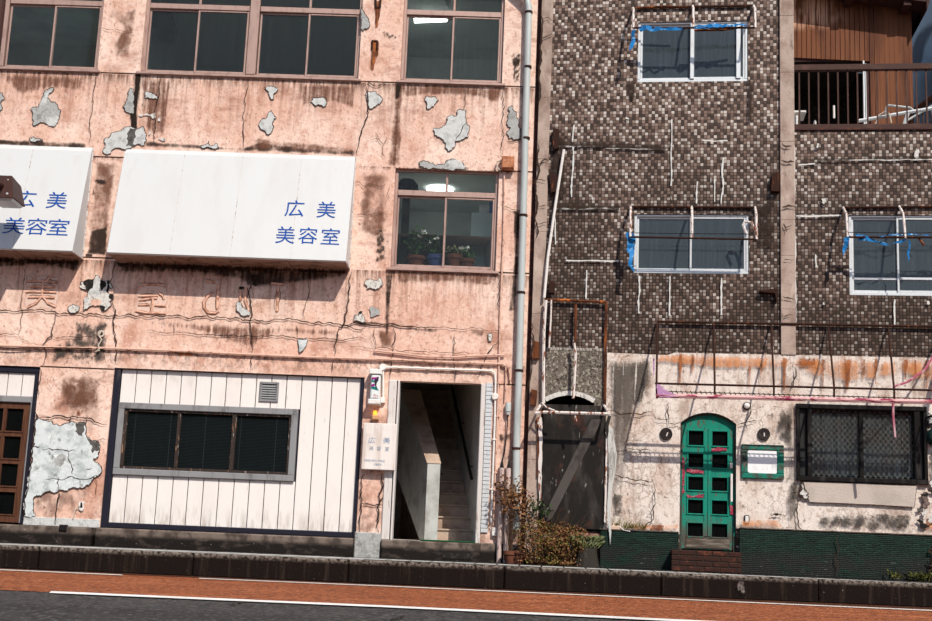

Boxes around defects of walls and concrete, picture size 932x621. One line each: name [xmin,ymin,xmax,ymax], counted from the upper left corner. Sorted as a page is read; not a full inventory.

flaking render [29,87,61,142]
flaking render [419,109,470,171]
flaking render [506,106,522,142]
flaking render [68,275,114,314]
peeling [354,306,380,322]
water stain [62,378,97,406]
crack [0,262,498,515]
corrosion [659,354,788,390]
corrosion [799,358,932,390]
peeling [23,418,103,518]
crack [359,473,384,533]
flaking render [898,479,932,529]